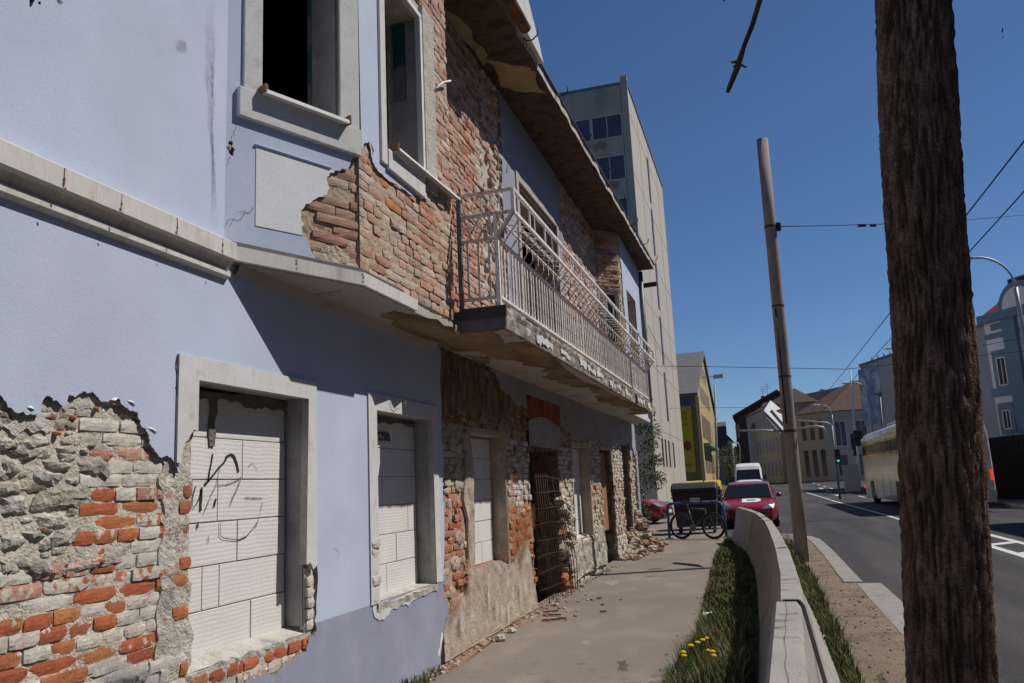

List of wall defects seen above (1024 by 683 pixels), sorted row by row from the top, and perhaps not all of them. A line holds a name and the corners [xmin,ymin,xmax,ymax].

spalling [0,393,315,683]
spalling [301,0,651,664]